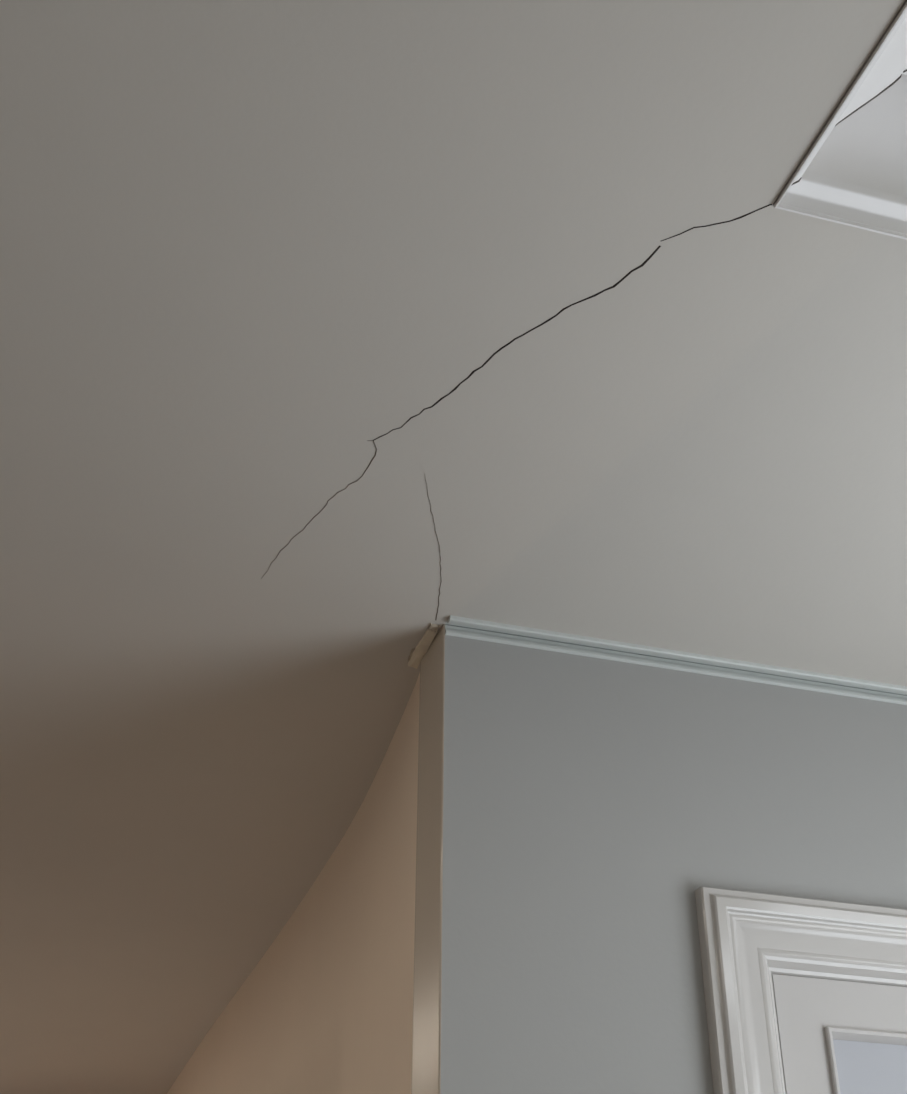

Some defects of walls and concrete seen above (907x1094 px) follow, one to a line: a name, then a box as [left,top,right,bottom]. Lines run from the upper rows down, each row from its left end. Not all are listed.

crack [835,70,907,126]
crack [261,204,772,579]
crack [425,479,442,620]